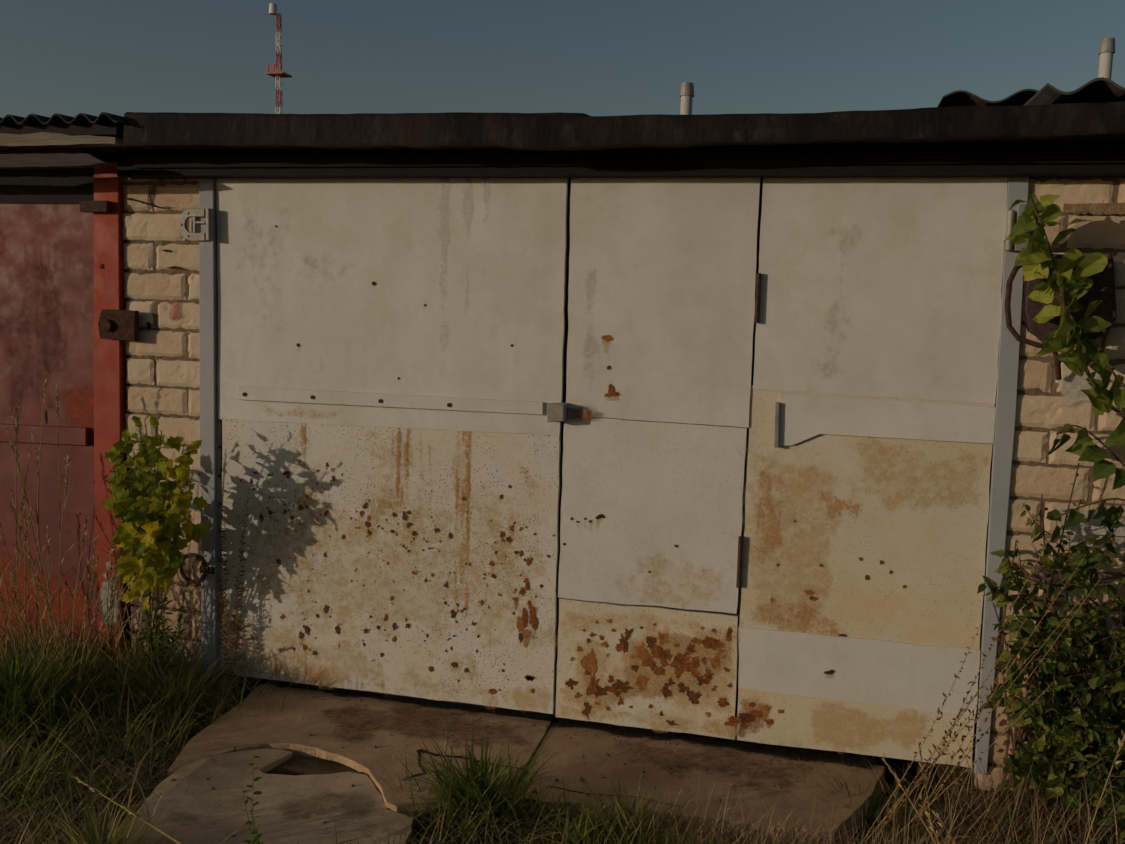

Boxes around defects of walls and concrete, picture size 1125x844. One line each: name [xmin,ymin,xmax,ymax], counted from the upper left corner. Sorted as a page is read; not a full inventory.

corrosion [222,413,543,689]
corrosion [750,465,858,635]
corrosion [479,663,547,707]
corrosion [580,635,730,718]